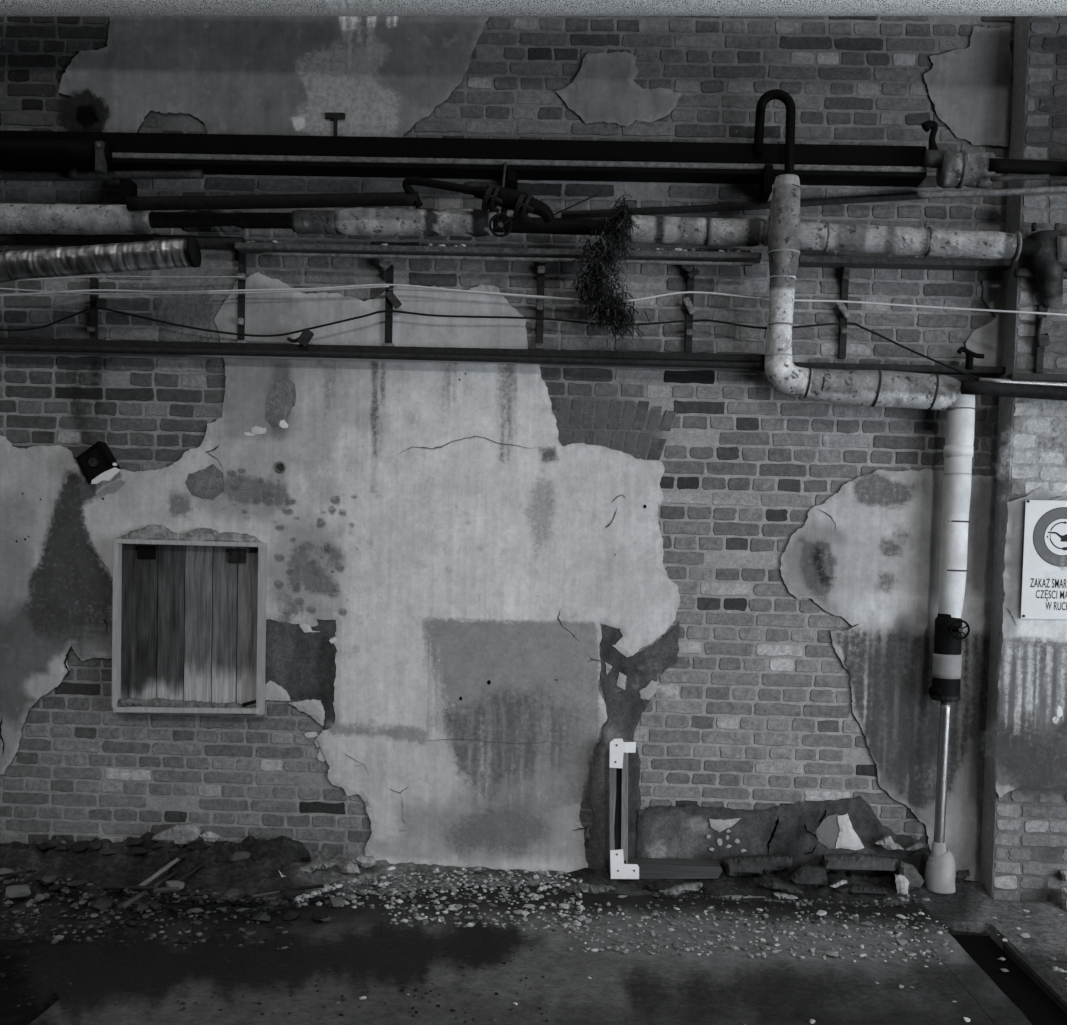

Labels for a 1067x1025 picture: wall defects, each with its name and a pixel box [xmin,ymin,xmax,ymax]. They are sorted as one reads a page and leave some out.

flaking render [58,16,490,137]
flaking render [214,272,528,349]
crack [399,436,537,454]
damp [26,471,113,637]
flaking render [0,358,680,873]
damp [329,639,568,852]
flaking render [780,468,1067,882]
damp [1004,641,1067,740]